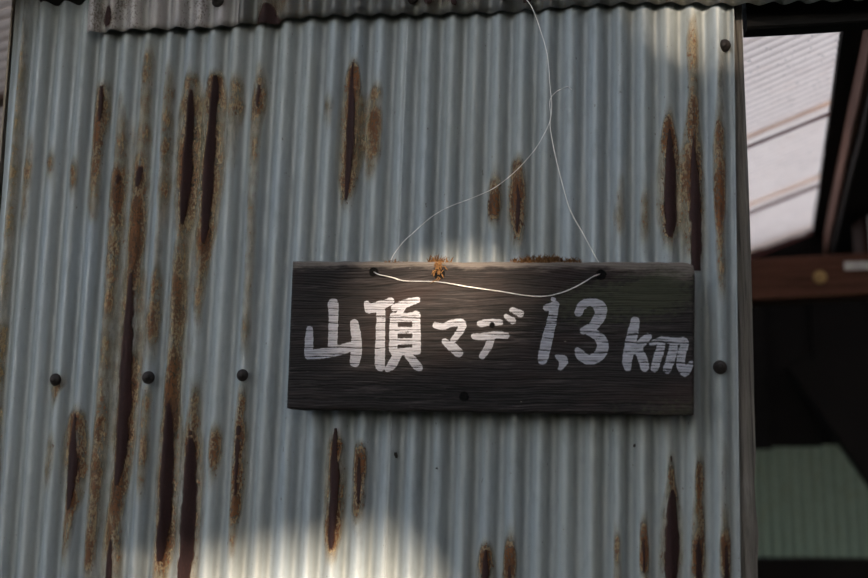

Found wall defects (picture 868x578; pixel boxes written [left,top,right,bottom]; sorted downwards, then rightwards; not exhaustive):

rust [325,58,382,204]
rust [487,158,527,244]
rust [641,21,726,289]
rust [45,49,267,578]
rust [324,428,367,559]
rust [478,534,517,578]
rust [639,456,681,578]
rust [691,460,706,578]